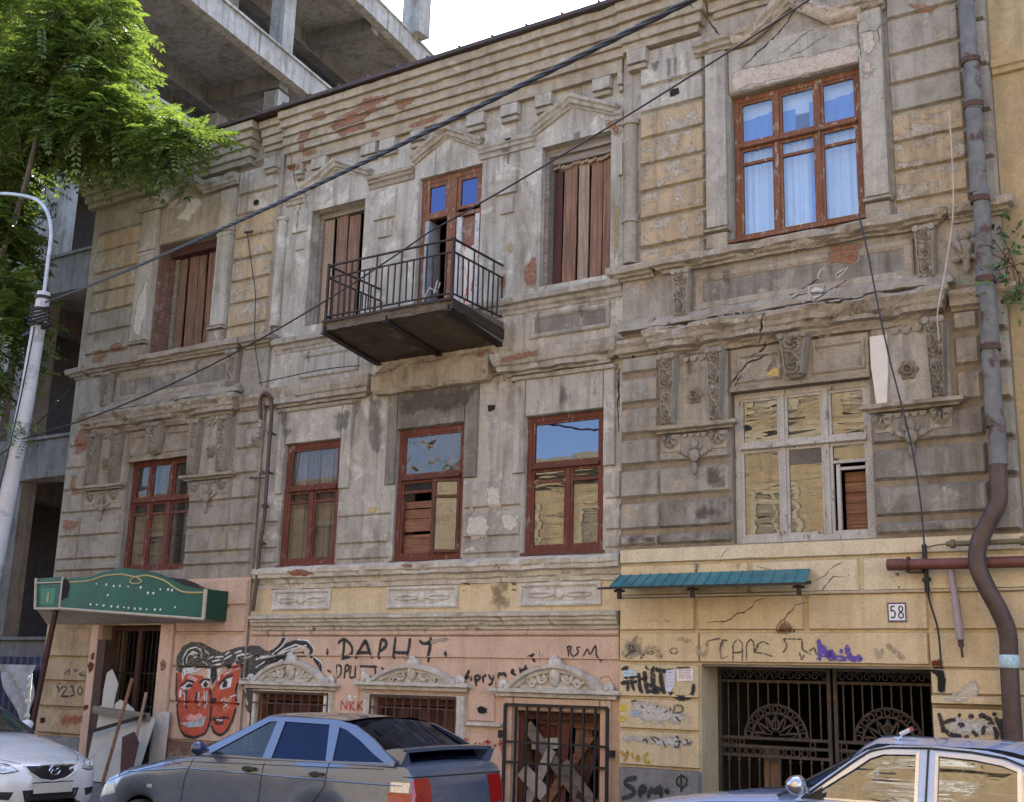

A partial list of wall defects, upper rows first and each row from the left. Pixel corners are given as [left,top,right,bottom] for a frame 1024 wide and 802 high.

crack [741,1,826,70]
flaking render [282,95,416,171]
flaking render [522,257,538,289]
crack [790,266,848,302]
flaking render [788,237,864,301]
peeling [92,277,150,363]
crack [731,311,768,386]
peeling [463,487,522,552]
crack [778,563,840,624]